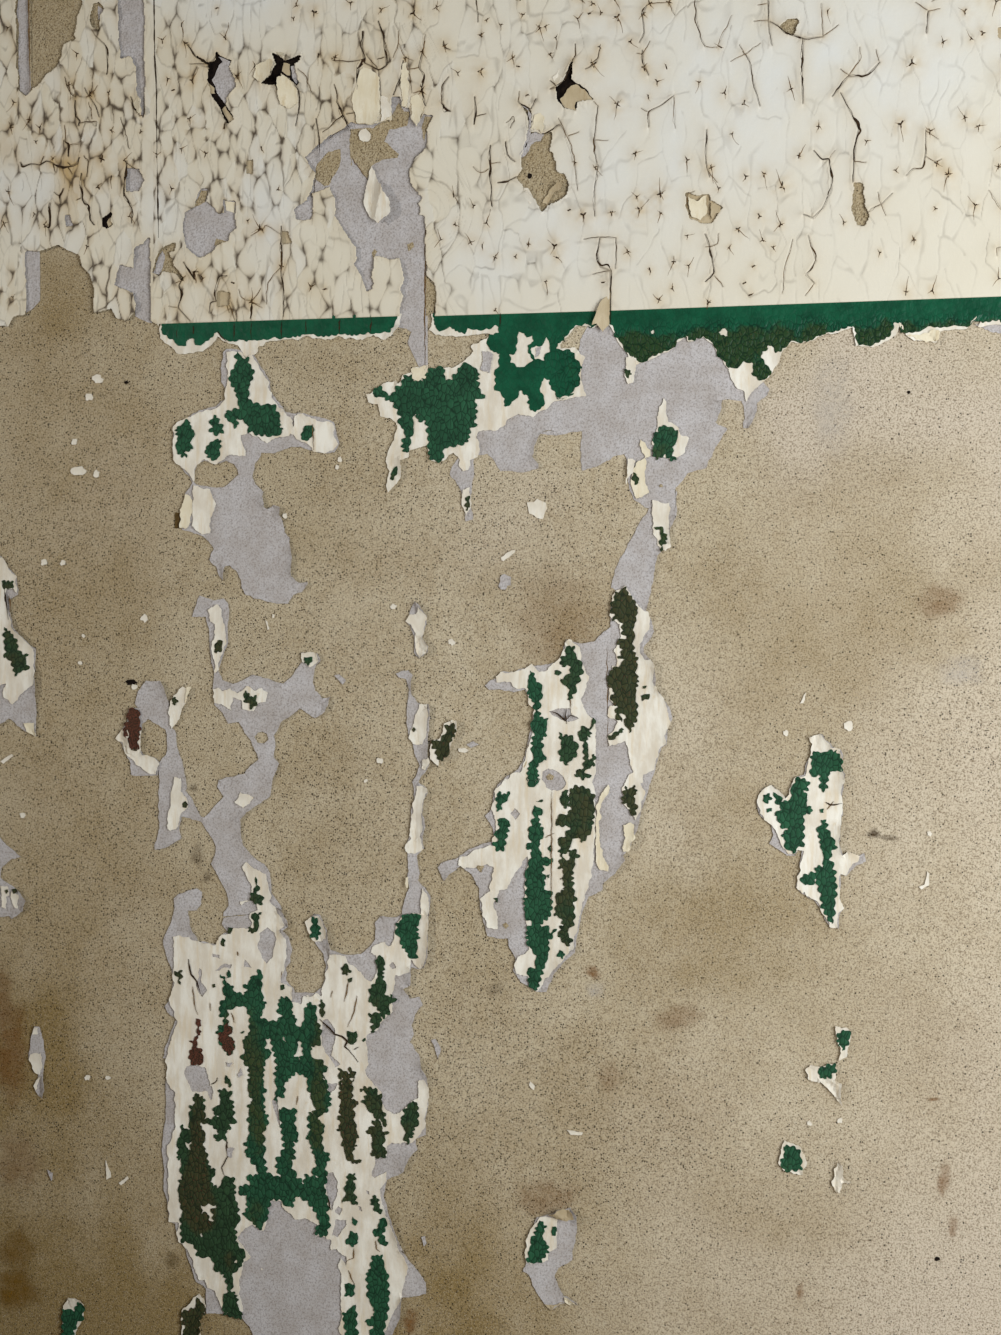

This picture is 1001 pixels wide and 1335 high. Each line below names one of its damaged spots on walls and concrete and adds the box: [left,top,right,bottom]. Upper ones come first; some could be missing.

crack [0,0,257,254]
crack [170,216,327,320]
crack [292,0,1001,324]
peeling [0,0,1001,992]
peeling [116,596,479,1335]
peeling [805,1026,851,1123]
peeling [523,1208,577,1311]